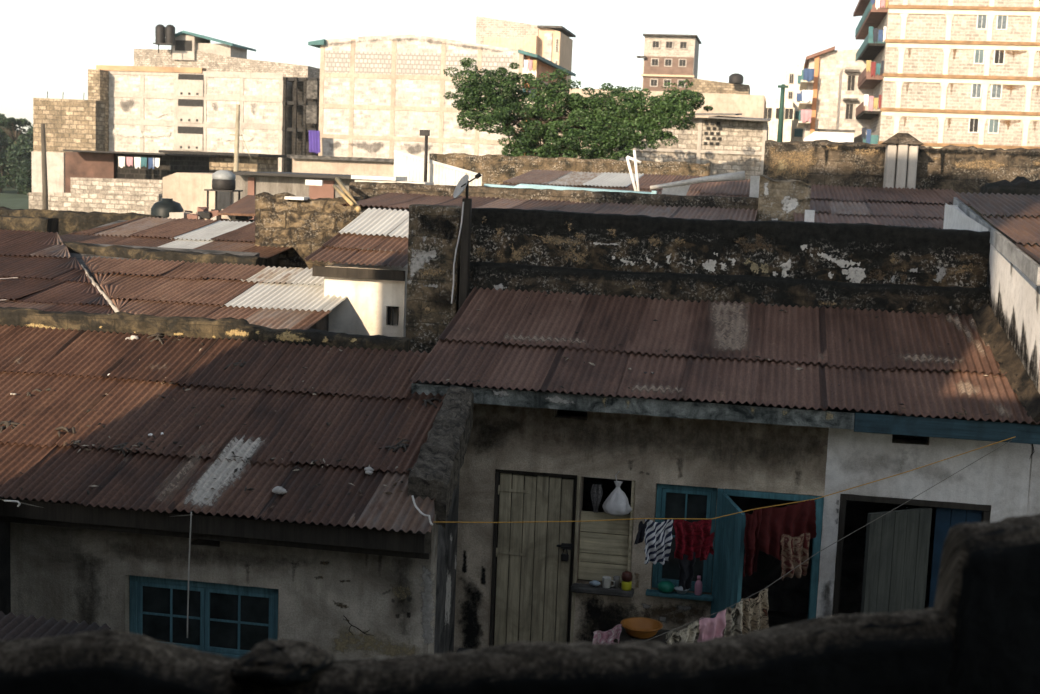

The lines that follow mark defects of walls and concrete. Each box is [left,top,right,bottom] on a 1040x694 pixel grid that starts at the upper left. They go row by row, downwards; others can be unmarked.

peeling [690,252,736,272]
peeling [773,259,791,278]
peeling [801,244,866,283]
leakage [986,259,1038,390]
leakage [459,551,486,649]